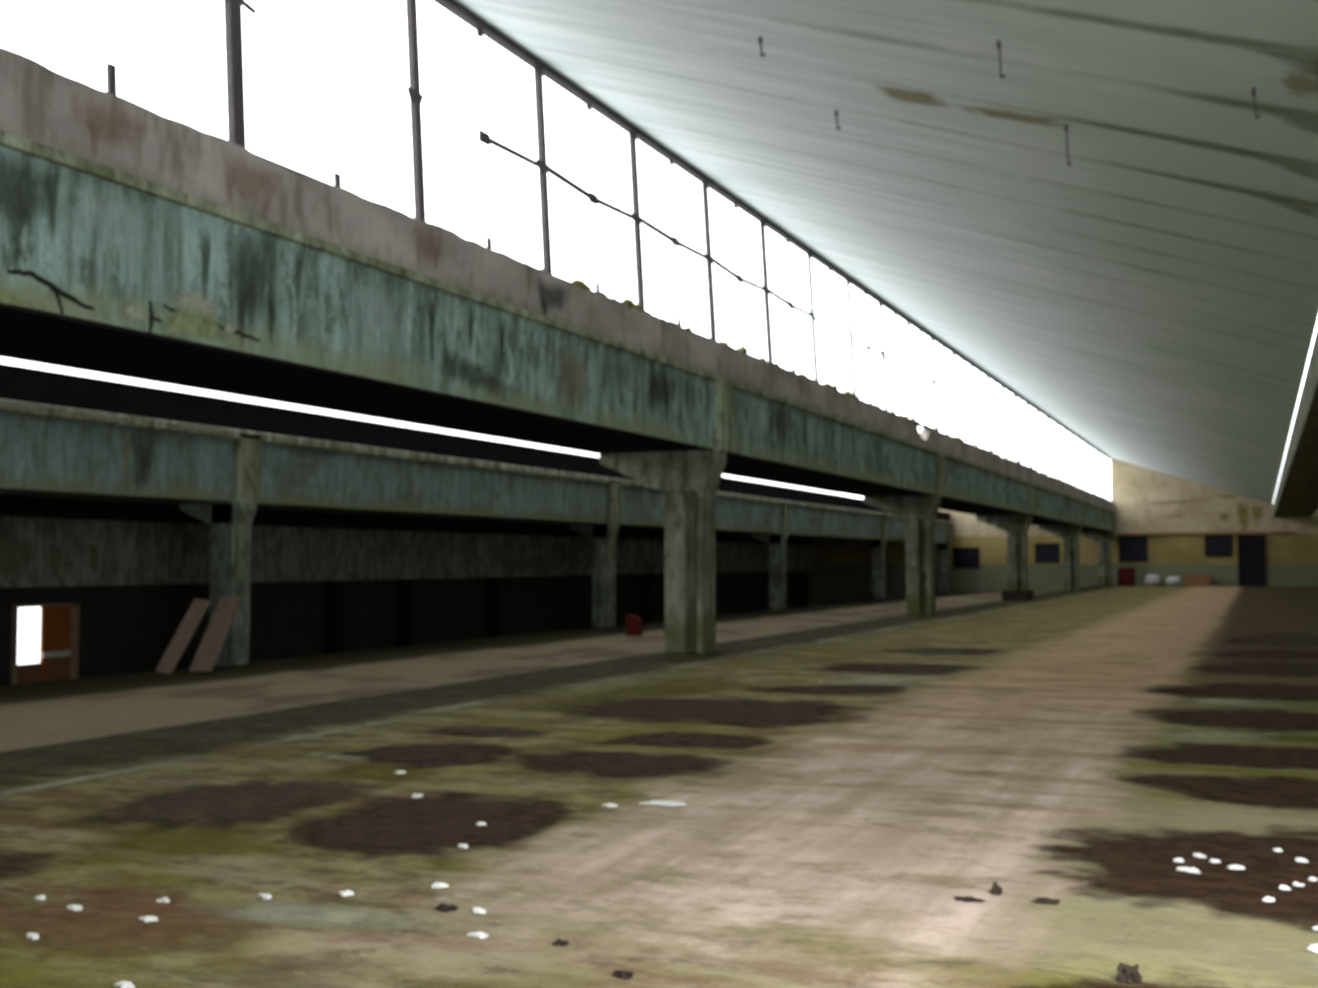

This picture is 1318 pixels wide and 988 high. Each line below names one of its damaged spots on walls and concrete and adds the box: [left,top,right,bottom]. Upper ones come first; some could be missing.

damp [0,160,57,252]
crack [6,269,94,315]
damp [239,243,274,334]
damp [540,284,563,314]
damp [454,360,505,391]